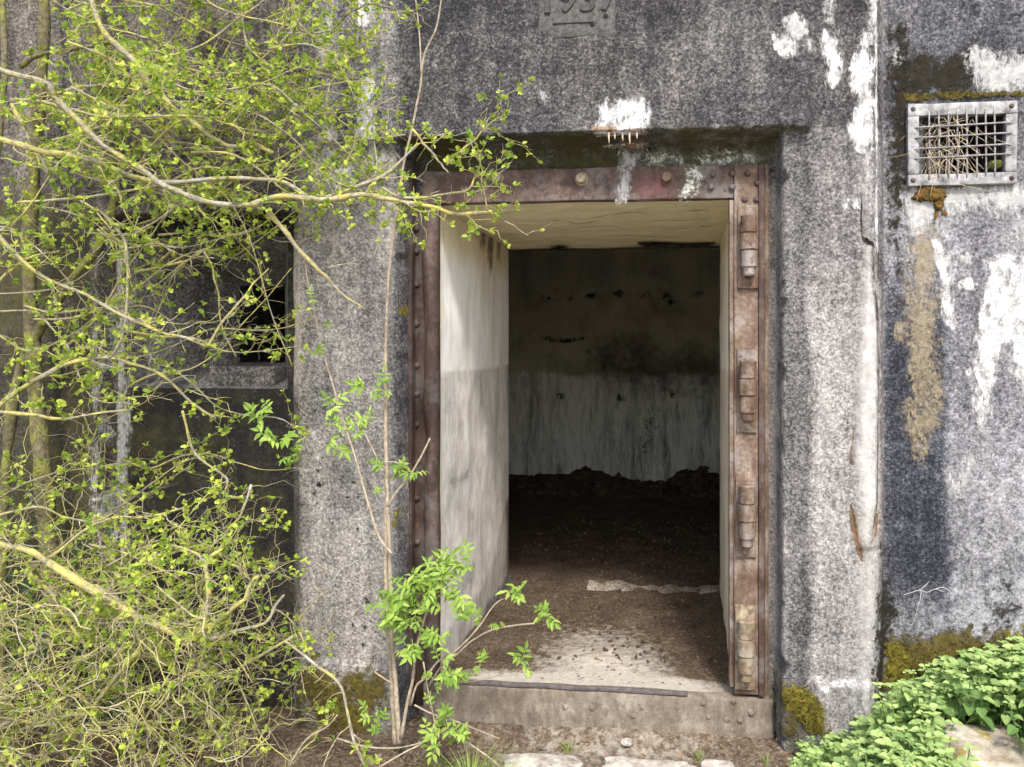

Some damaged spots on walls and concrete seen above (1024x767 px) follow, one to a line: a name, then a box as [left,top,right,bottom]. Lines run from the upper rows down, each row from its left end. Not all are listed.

peeling [772,12,811,58]
water stain [593,96,683,203]
water stain [698,150,756,166]
water stain [821,0,1024,431]
crack [850,199,880,562]